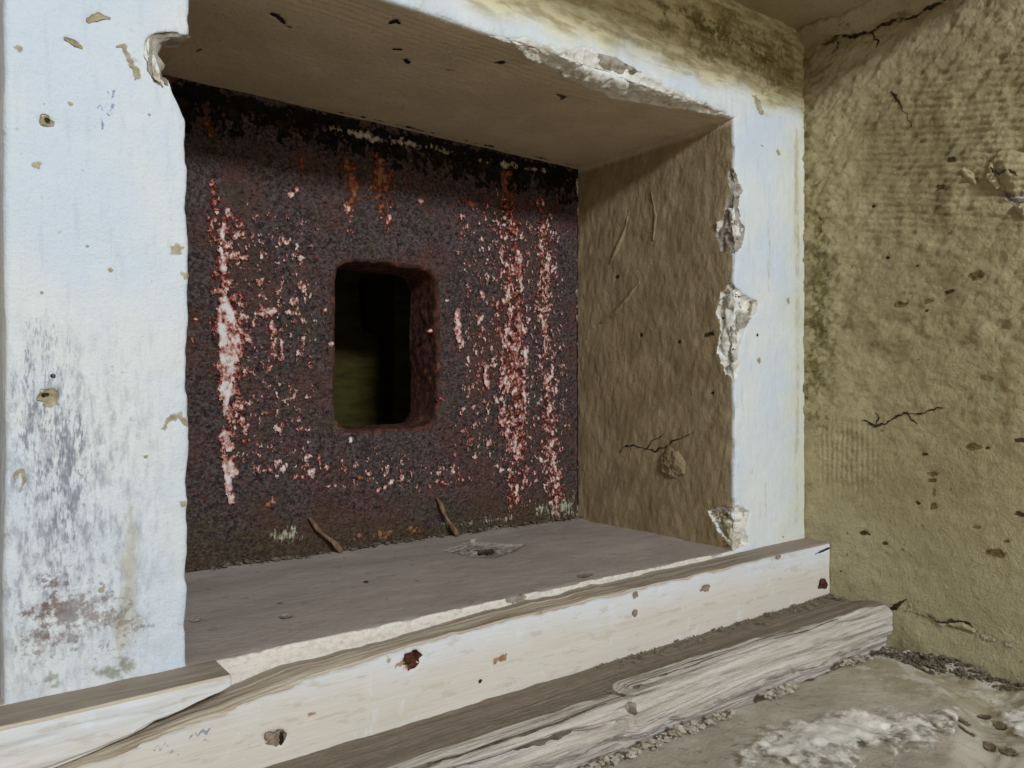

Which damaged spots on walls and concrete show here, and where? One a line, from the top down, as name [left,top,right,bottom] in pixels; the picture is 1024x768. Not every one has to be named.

crack [820,0,945,53]
spalling [489,36,727,116]
peeling [116,32,579,215]
spalling [715,170,746,253]
corrosion [206,178,284,505]
corrosion [453,308,464,351]
corrosion [457,169,567,518]
spalling [704,284,758,383]
crack [619,432,693,453]
crack [862,407,943,428]
crack [889,599,907,610]
corrosion [396,650,422,671]